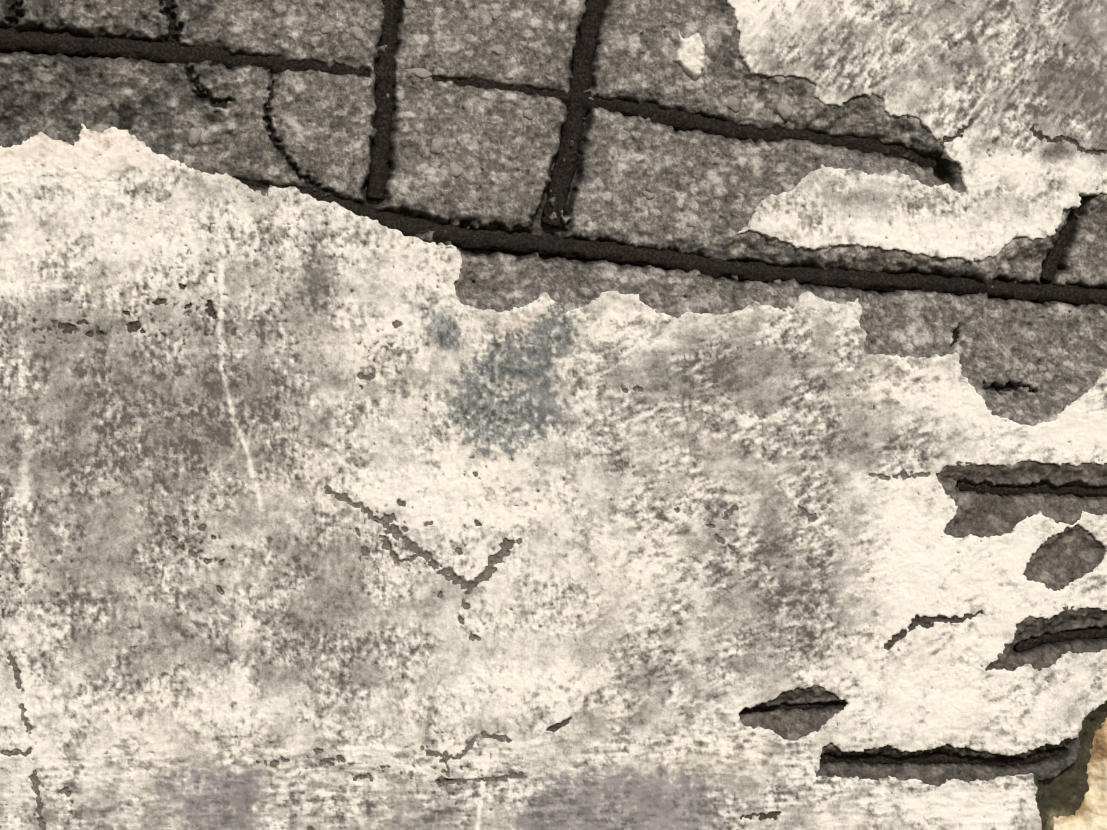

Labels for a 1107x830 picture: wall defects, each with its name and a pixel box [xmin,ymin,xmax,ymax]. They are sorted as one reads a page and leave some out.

spalling [0,0,1107,426]
crack [323,486,522,595]
hole [706,505,738,551]
hole [798,505,818,522]
spalling [936,459,1107,591]
crack [884,610,983,650]
spalling [985,606,1107,672]
spalling [739,685,848,741]
spalling [816,737,1082,787]